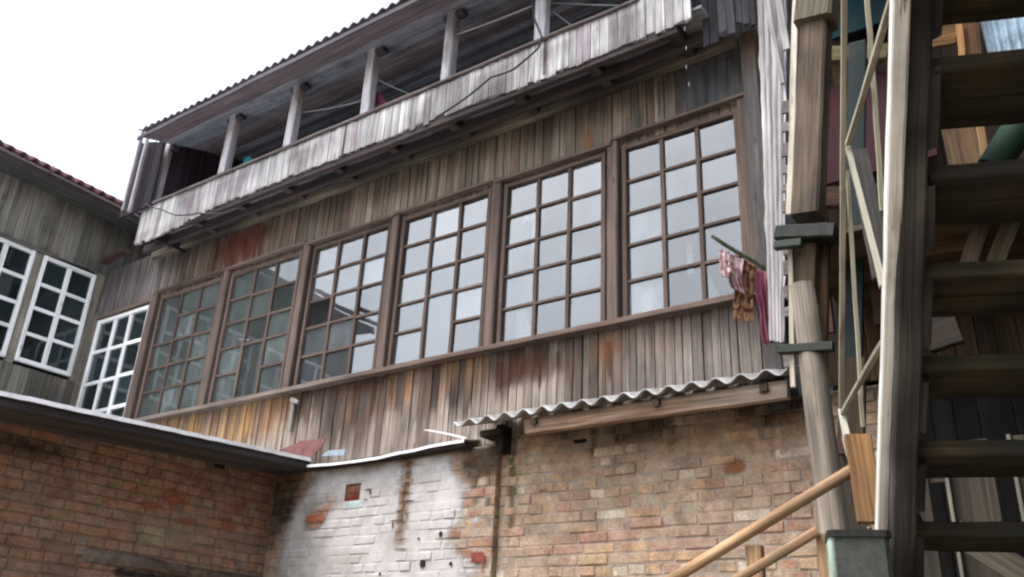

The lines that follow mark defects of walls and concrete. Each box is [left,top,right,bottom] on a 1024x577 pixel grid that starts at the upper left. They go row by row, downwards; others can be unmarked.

peeling [279,454,485,577]